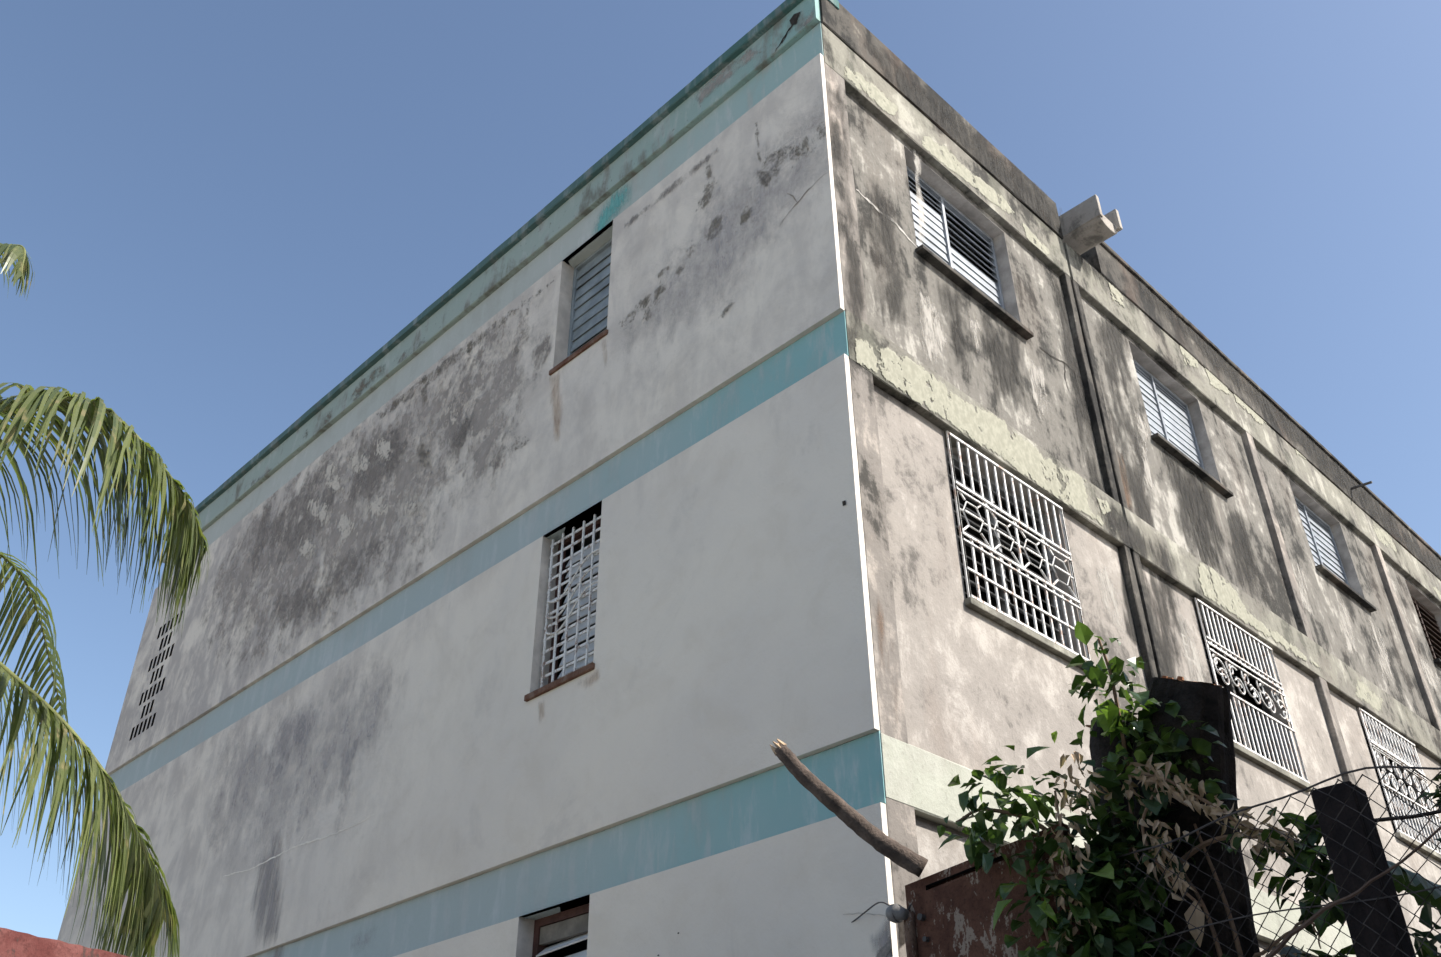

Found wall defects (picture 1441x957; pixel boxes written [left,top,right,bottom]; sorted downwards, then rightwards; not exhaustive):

water stain [757,120,846,186]
water stain [875,48,1062,240]
water stain [838,183,863,347]
water stain [872,185,903,319]
water stain [214,308,550,659]
water stain [920,287,1047,413]
water stain [1075,254,1441,598]